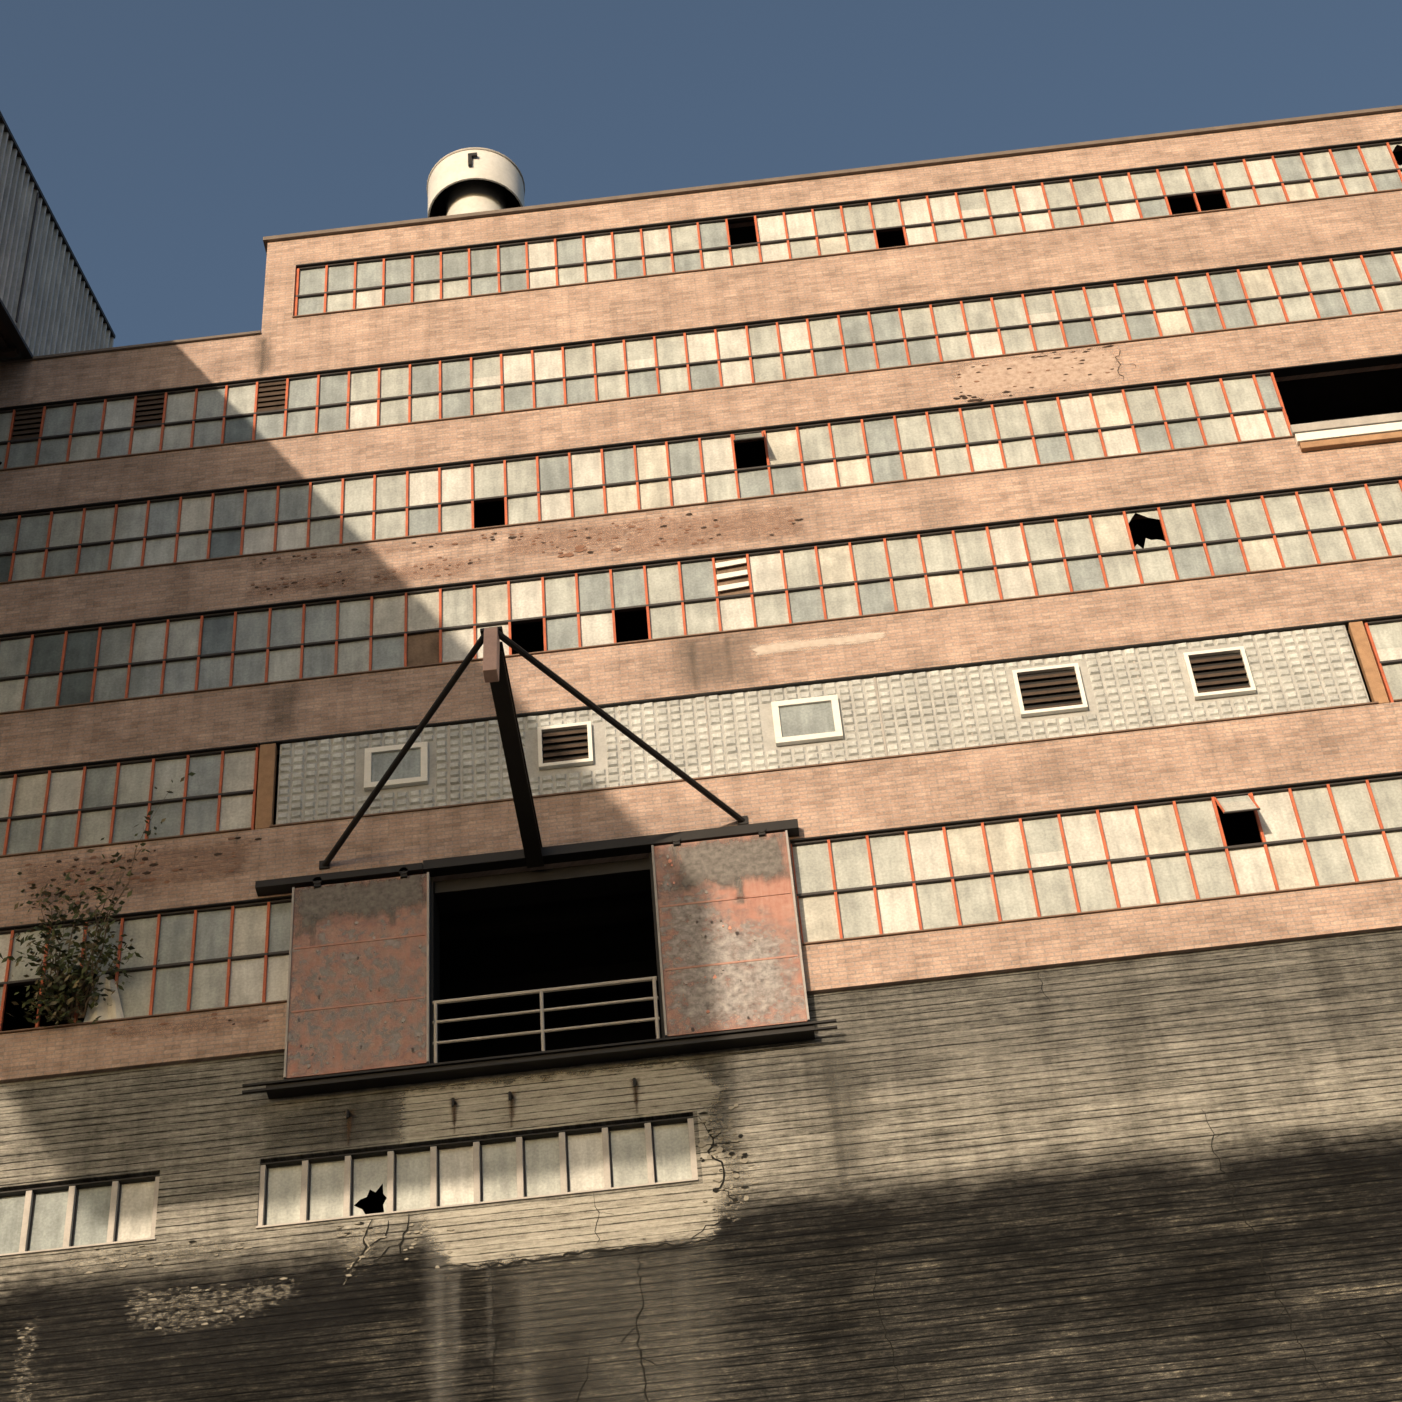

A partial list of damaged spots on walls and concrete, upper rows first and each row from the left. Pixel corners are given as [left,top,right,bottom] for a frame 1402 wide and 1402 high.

spalling [951,345,1119,402]
spalling [251,549,361,595]
crack [342,1117,739,1402]
spalling [126,1277,303,1330]